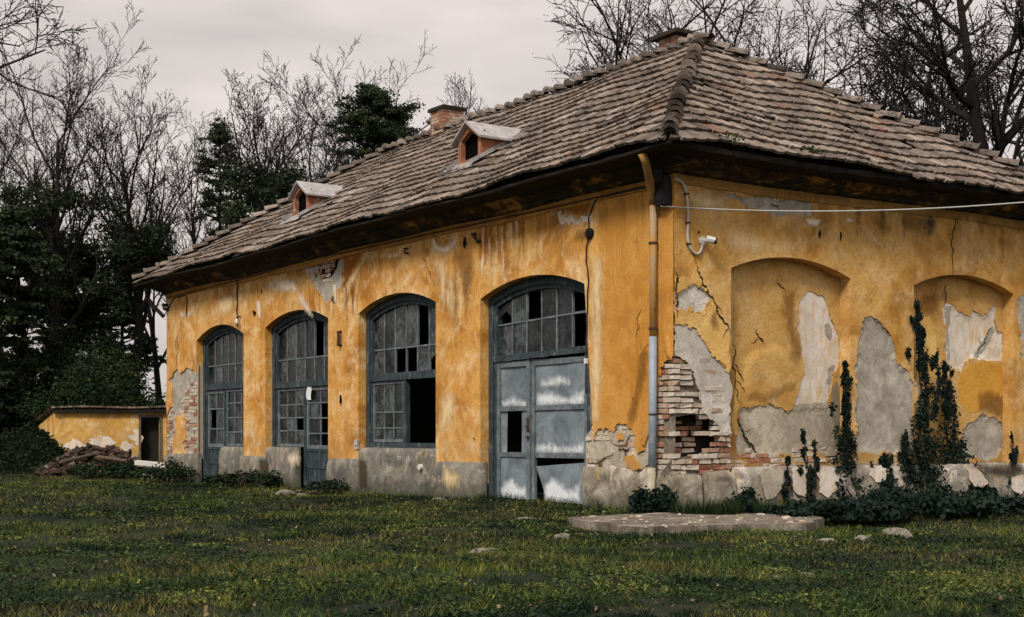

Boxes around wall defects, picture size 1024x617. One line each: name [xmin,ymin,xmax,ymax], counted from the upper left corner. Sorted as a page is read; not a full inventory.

peeling [725,192,812,220]
peeling [305,257,352,304]
water stain [440,226,504,313]
flaking render [165,366,203,458]
flaking render [585,264,840,499]
crack [675,254,764,453]
peeling [853,303,1003,487]